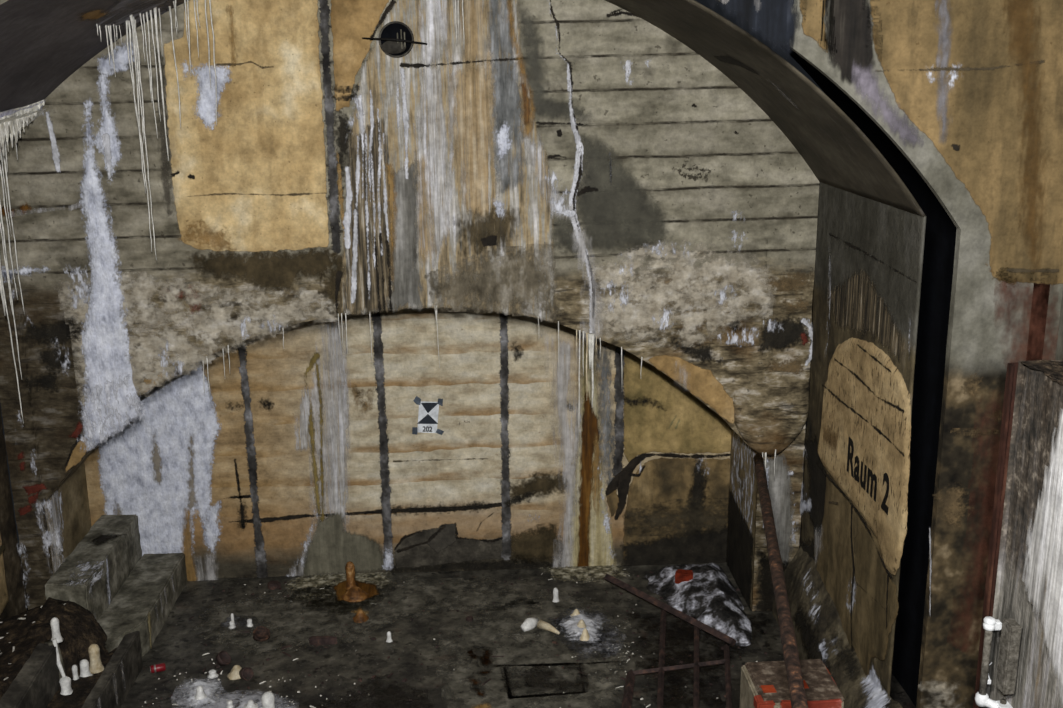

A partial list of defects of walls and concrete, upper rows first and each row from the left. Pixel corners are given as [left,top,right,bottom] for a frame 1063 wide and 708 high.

efflorescence [1,267,48,295]
efflorescence [41,109,61,172]
efflorescence [56,42,337,581]
water stain [387,165,396,251]
water stain [416,0,587,265]
crack [536,0,598,333]
water stain [554,137,781,347]
efflorescence [36,492,63,567]
corrosion [577,393,602,567]
crack [605,453,731,520]